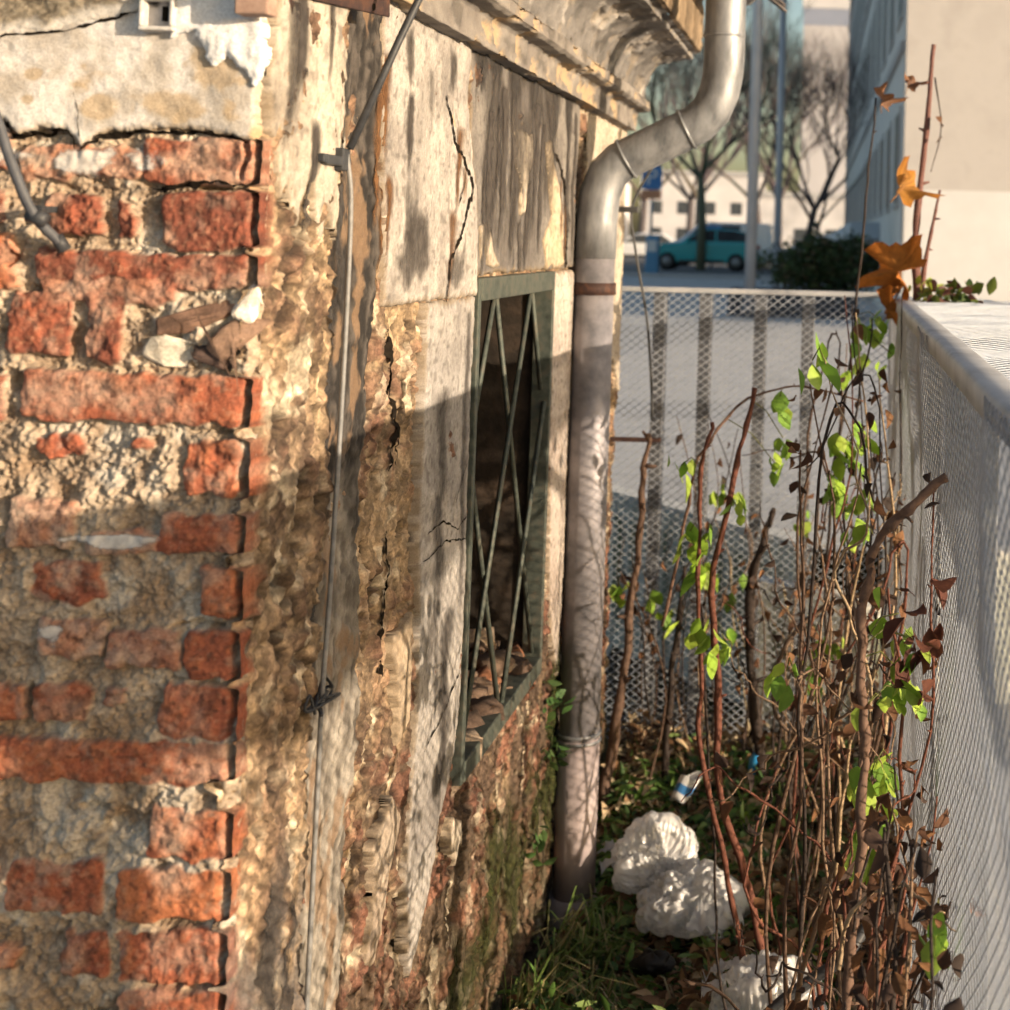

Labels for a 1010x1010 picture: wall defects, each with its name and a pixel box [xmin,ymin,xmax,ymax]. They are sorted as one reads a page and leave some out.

rust [234,0,390,18]
crack [4,93,247,152]
leakage [400,186,428,287]
leakage [451,258,464,286]
crack [446,97,474,302]
leakage [476,51,578,272]
spalling [0,0,627,1010]